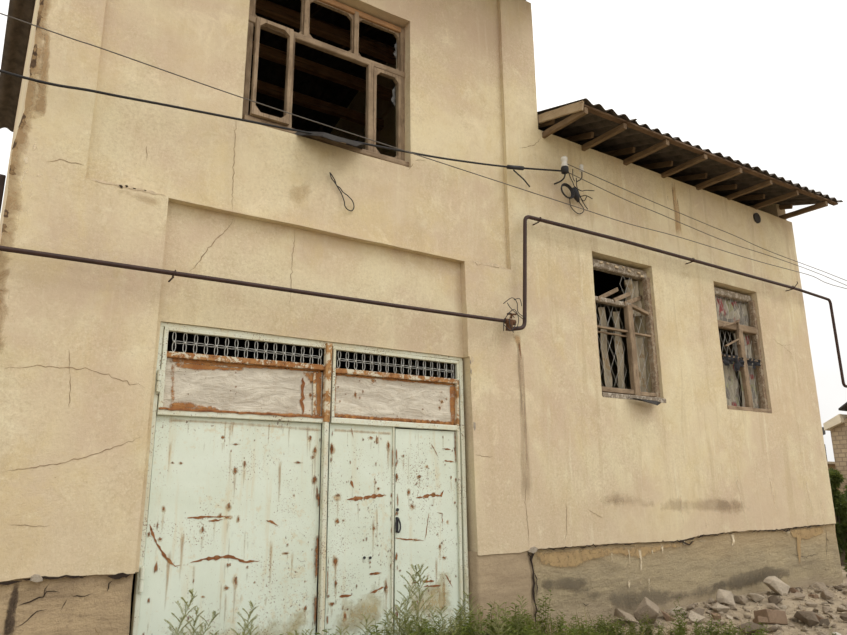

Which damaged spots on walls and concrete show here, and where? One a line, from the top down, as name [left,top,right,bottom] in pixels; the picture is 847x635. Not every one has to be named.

leakage [0,0,49,257]
crack [190,128,237,271]
crack [5,352,145,403]
corrosion [334,374,456,462]
crack [8,441,133,471]
corrosion [188,503,239,532]
corrosion [336,475,444,546]
crack [0,573,130,627]
corrosion [148,523,180,572]
corrosion [190,555,258,568]
corrosion [308,536,377,627]
spalling [538,542,693,568]